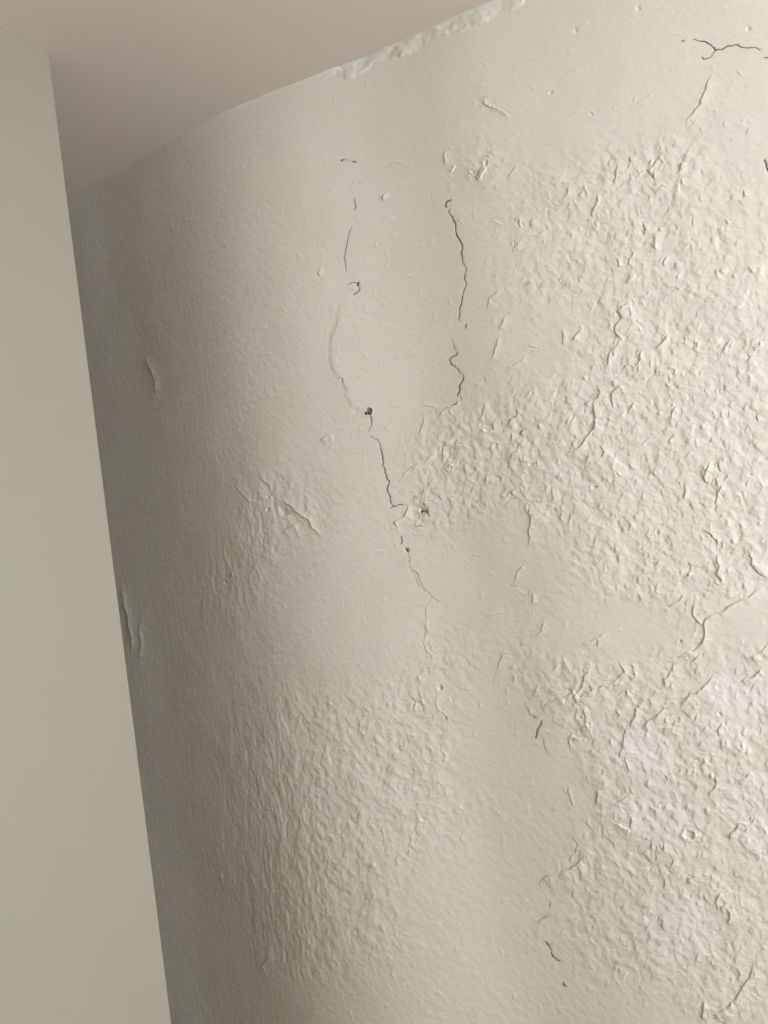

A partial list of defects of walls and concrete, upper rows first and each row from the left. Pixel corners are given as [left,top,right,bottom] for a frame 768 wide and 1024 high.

crack [681,39,768,60]
peeling [439,147,496,186]
peeling [557,152,689,222]
crack [445,199,467,406]
peeling [563,293,679,459]
flaking render [232,470,324,541]
crack [368,416,460,724]
peeling [509,503,536,586]
peeling [676,458,728,510]
peeling [536,524,768,766]
peeling [590,769,737,930]
peeling [693,960,759,1024]